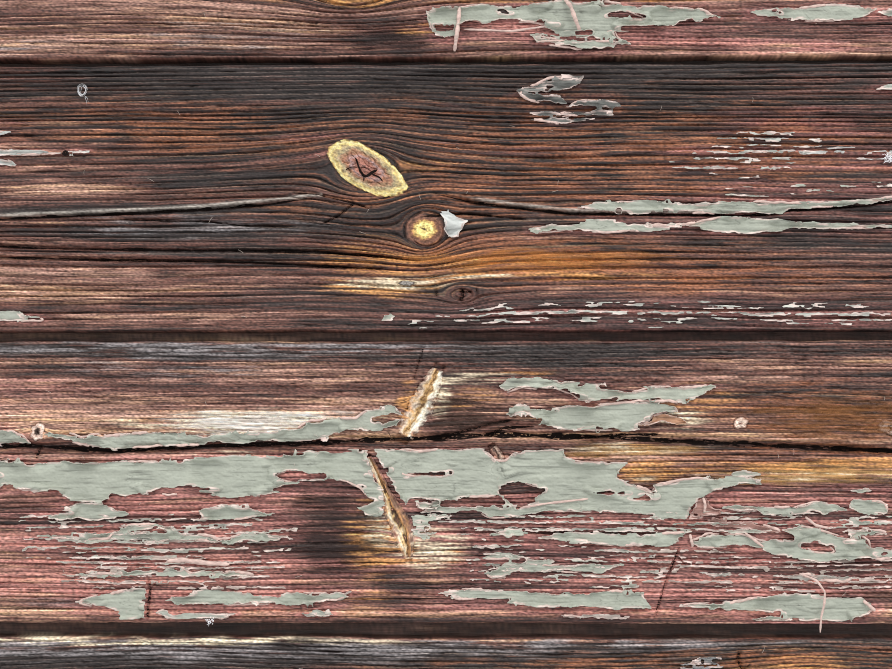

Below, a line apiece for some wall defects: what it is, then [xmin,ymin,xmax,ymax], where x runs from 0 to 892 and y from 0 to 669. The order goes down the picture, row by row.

peeling [426,0,721,51]
peeling [751,4,892,22]
peeling [517,74,621,124]
peeling [0,149,90,166]
peeling [669,131,892,179]
peeling [529,182,892,234]
peeling [499,377,716,433]
peeling [0,405,892,633]
peeling [680,657,724,669]